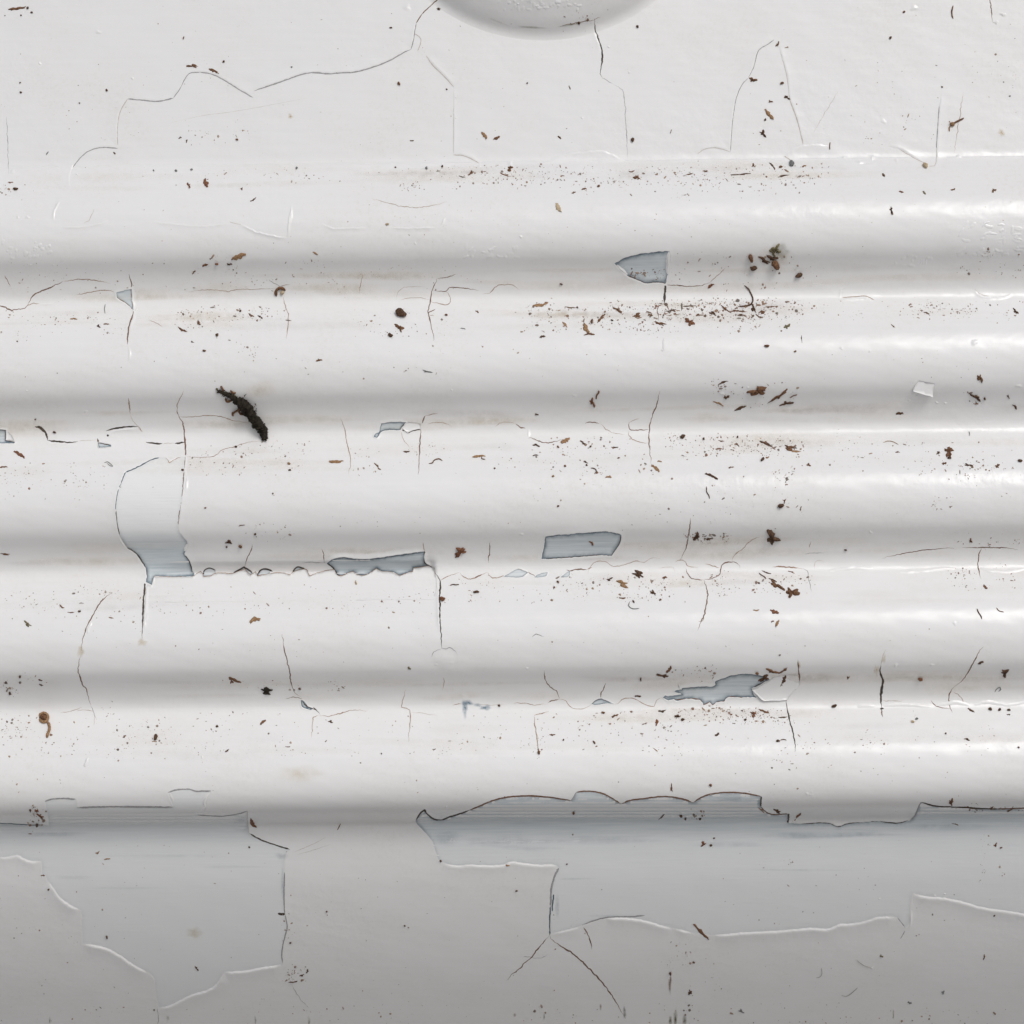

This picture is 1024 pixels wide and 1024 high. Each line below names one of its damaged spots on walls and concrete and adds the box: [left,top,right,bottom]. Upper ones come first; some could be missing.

crack [563,17,628,156]
peeling [610,245,723,319]
peeling [35,426,651,633]
peeling [590,666,800,711]
peeling [0,780,298,1023]
crack [509,928,623,1014]
peeling [407,782,1024,952]